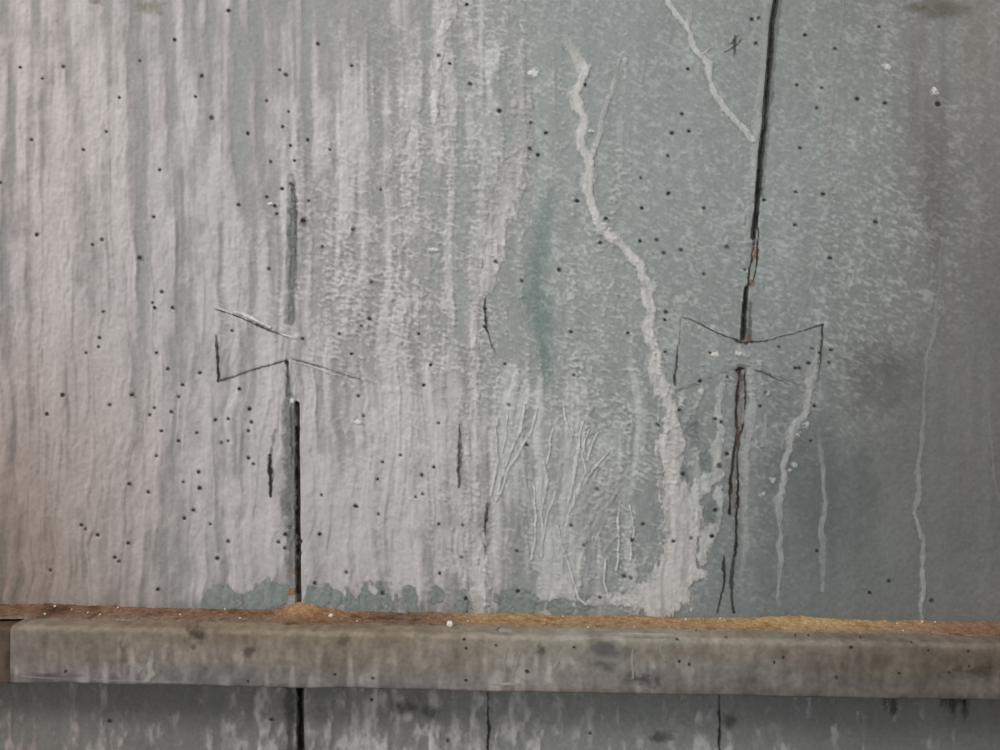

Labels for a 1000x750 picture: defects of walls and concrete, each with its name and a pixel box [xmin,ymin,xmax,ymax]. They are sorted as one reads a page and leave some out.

efflorescence [429,0,458,124]
efflorescence [665,0,766,227]
crack [741,0,778,339]
crack [267,361,301,594]
leakage [458,109,537,614]
leakage [525,39,725,617]
crack [717,367,747,613]
efflorescence [741,345,819,568]
efflorescence [819,467,828,538]
efflorescence [913,422,926,620]